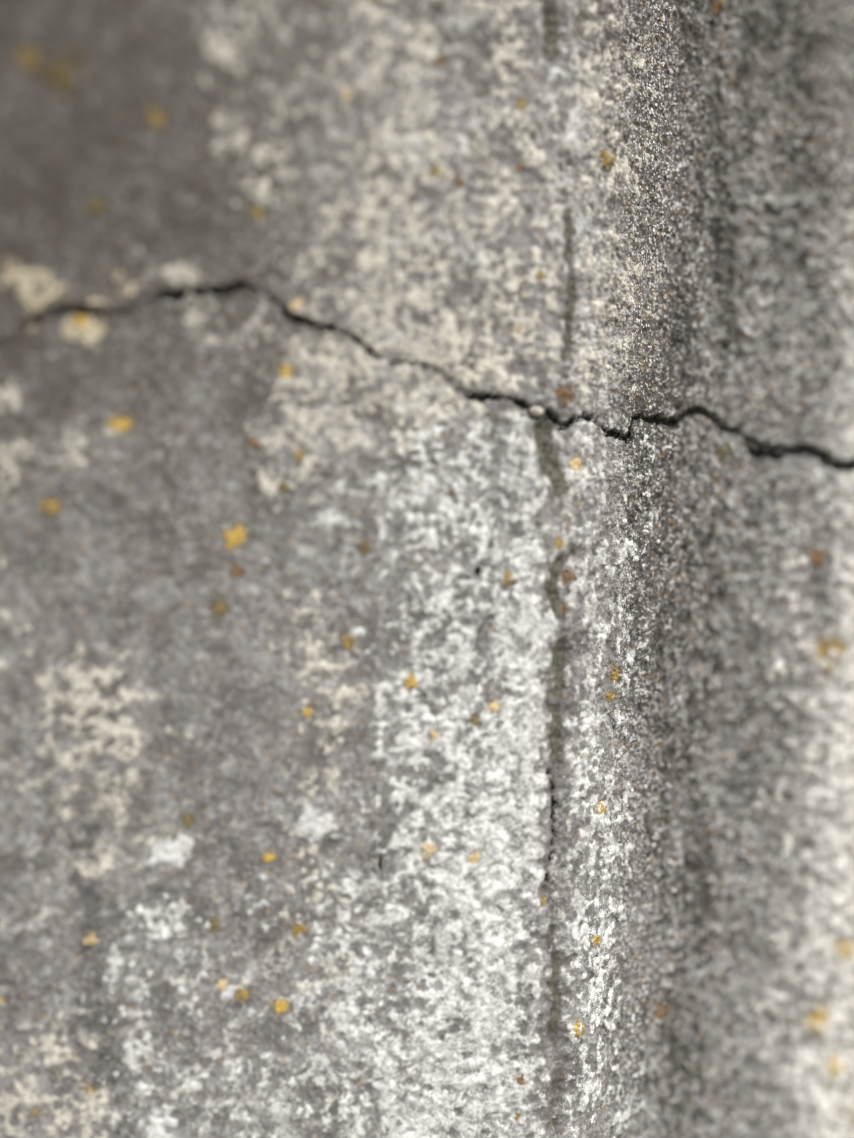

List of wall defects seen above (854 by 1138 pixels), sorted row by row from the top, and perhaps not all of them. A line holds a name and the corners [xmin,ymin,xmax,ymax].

crack [13,282,854,473]
crack [543,763,556,880]